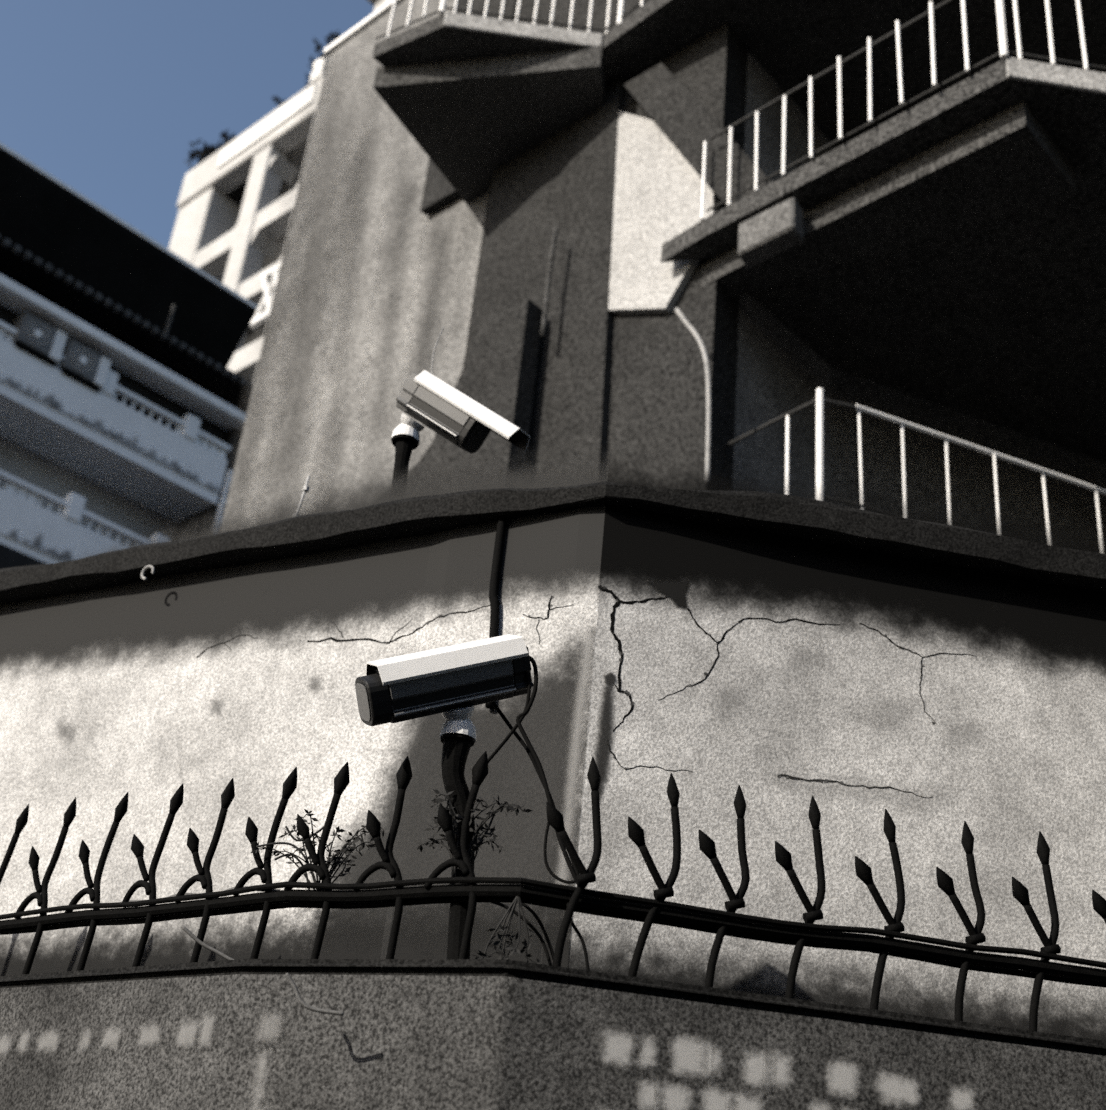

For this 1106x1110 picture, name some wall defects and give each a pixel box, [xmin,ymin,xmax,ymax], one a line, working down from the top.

crack [307,595,573,644]
crack [598,585,974,772]
crack [777,774,931,798]